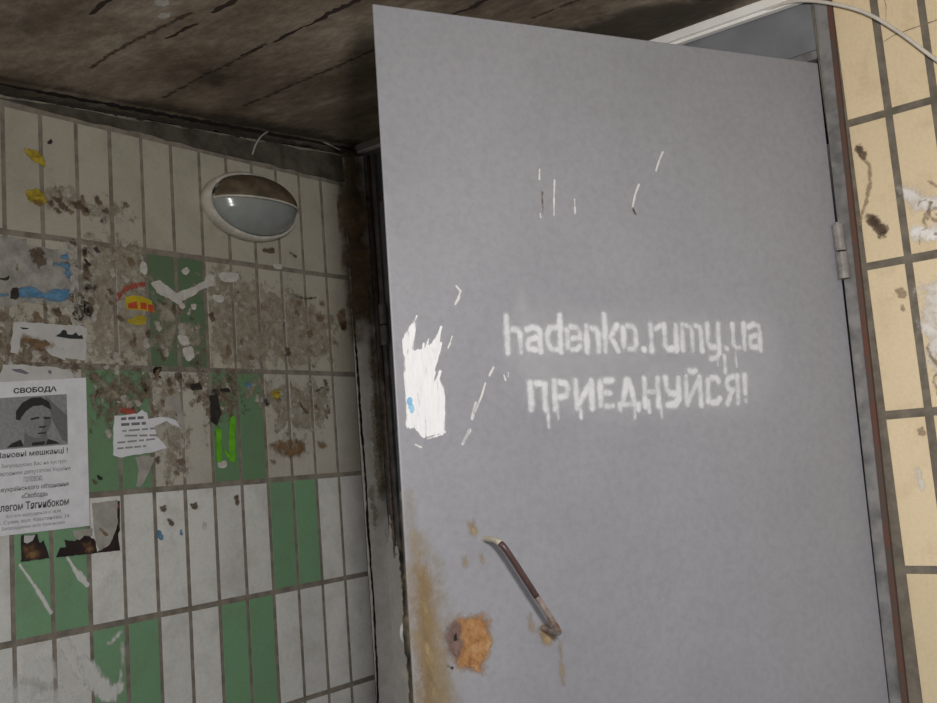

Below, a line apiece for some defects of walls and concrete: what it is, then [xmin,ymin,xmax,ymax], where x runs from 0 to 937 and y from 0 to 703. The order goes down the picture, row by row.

crack [451,0,488,15]
water stain [571,0,734,41]
crack [882,20,937,43]
crack [0,0,375,150]
peeling [33,186,102,216]
peeling [67,240,100,322]
peeling [109,239,148,283]
peeling [213,272,239,306]
peeling [22,306,62,323]
peeling [115,293,206,426]
rust [446,615,493,672]